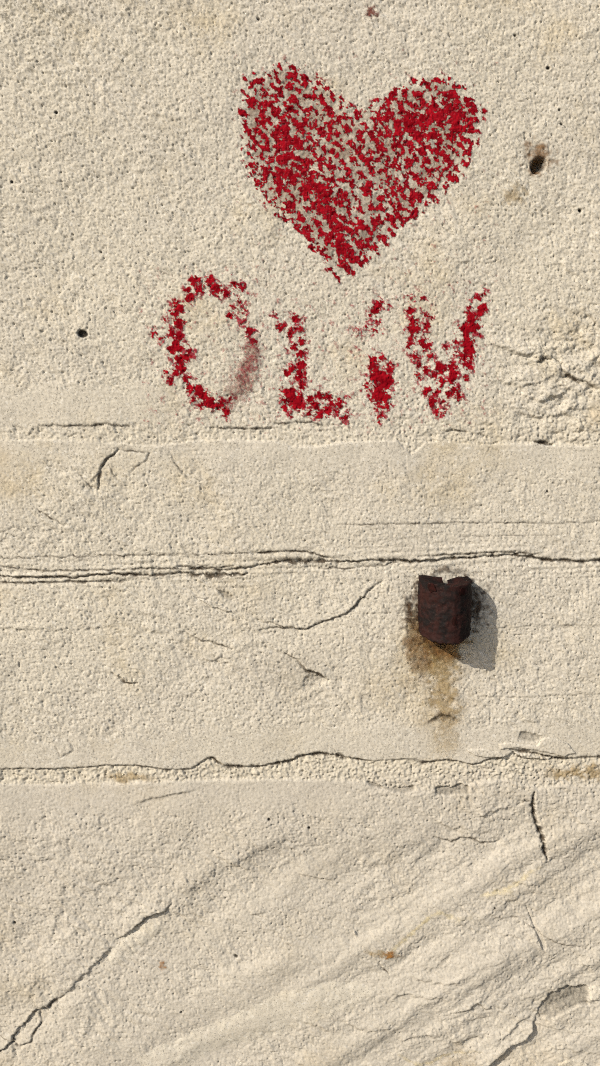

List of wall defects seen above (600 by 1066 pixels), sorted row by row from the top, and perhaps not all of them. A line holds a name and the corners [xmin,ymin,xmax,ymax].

crack [48,424,149,487]
crack [0,550,600,600]
corrosion [459,574,492,633]
corrosion [404,565,459,705]
crack [18,752,363,770]
crack [421,749,566,765]
crack [523,796,546,855]